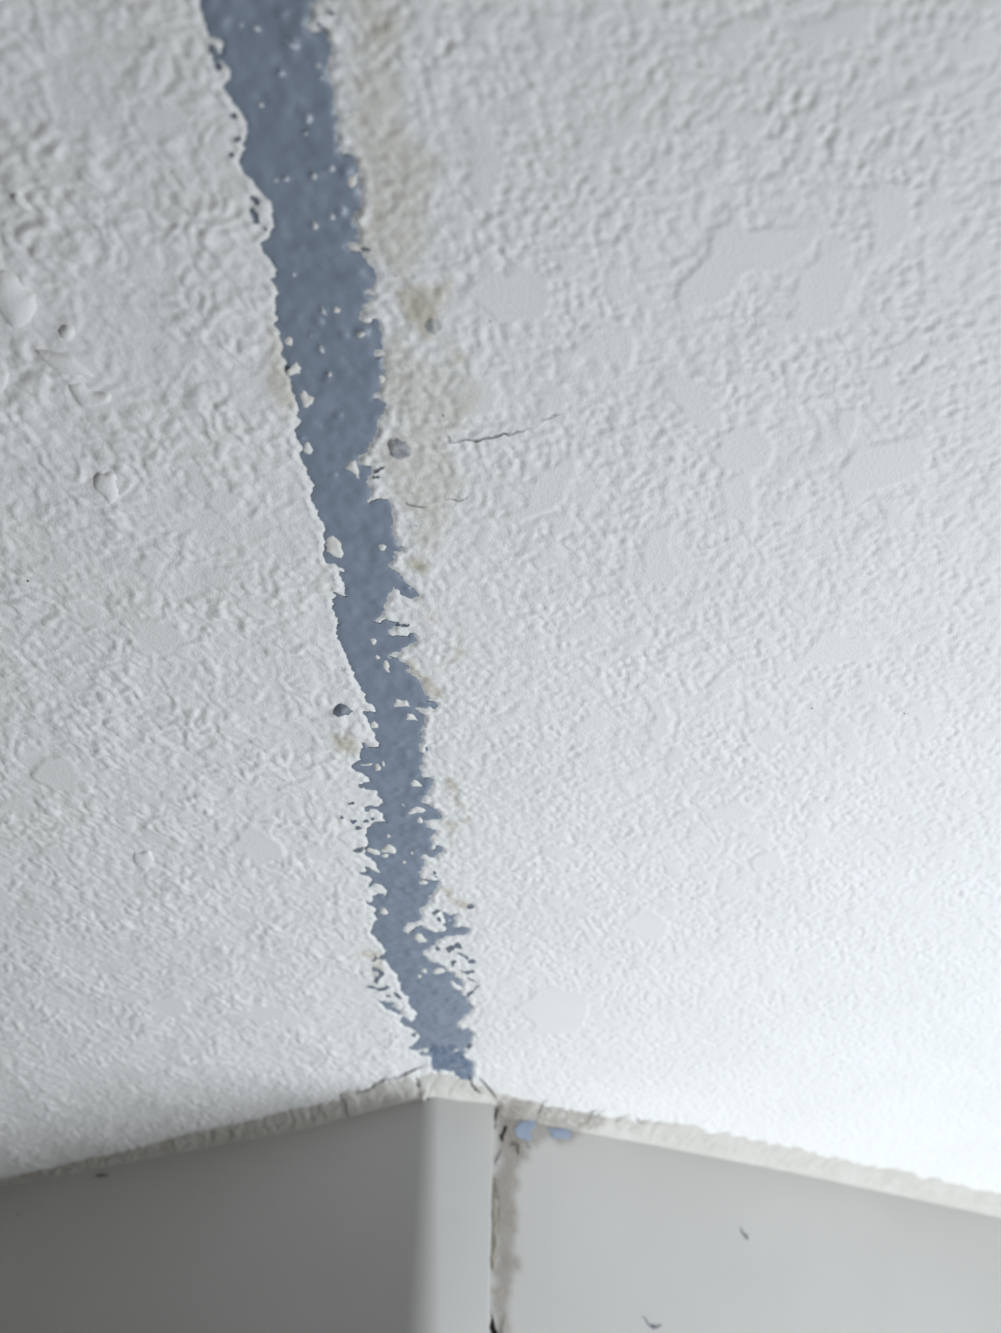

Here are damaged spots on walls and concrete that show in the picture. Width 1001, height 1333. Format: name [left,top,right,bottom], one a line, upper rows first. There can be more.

crack [448,415,559,443]
peeling [200,0,480,1081]
peeling [513,1119,572,1142]